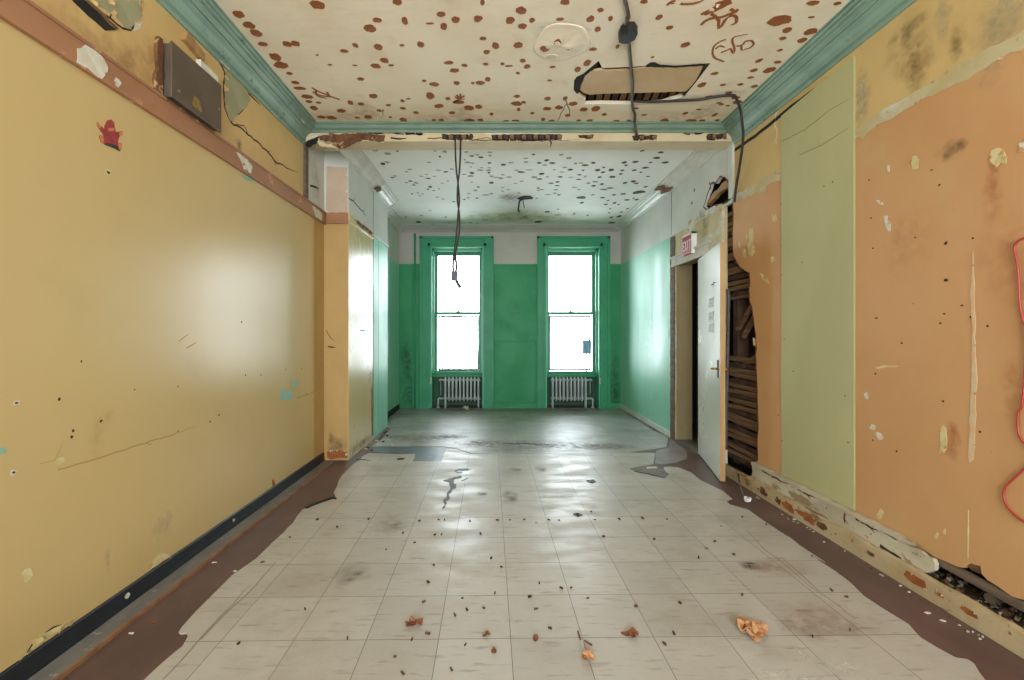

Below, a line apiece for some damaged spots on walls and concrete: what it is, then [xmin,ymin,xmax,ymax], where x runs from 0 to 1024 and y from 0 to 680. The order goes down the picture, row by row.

peeling [90,0,144,31]
peeling [77,45,122,87]
spalling [232,11,426,165]
peeling [854,30,1024,139]
crack [219,63,319,189]
spalling [390,37,669,224]
peeling [703,169,781,217]
peeling [960,237,989,462]
peeling [757,486,828,530]
spalling [967,510,982,574]
peeling [904,570,944,598]
peeling [734,617,768,642]